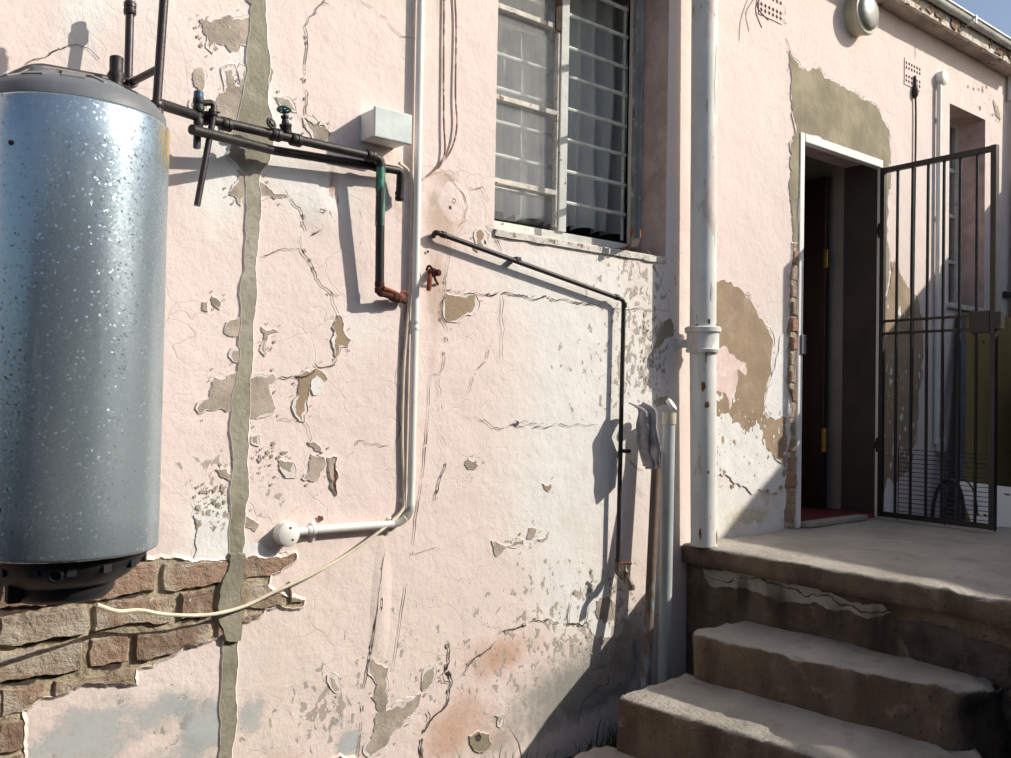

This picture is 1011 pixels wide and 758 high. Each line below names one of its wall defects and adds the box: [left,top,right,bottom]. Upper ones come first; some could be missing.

crack [15,44,99,70]
peeling [187,9,250,135]
crack [302,0,331,134]
peeling [716,50,924,530]
peeling [250,361,339,496]
crack [349,329,404,456]
crack [412,236,670,555]
flaking render [0,463,232,758]
flaking render [241,509,306,624]
crack [357,554,407,757]
peeling [330,657,441,758]
crack [420,606,603,758]